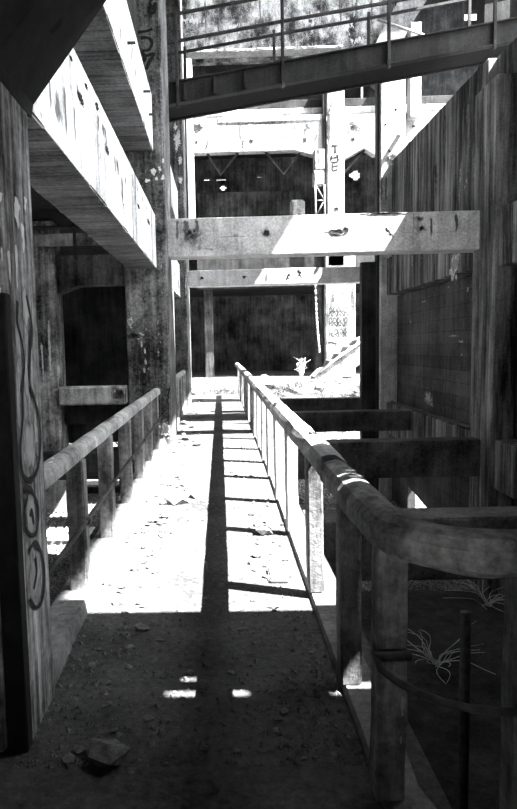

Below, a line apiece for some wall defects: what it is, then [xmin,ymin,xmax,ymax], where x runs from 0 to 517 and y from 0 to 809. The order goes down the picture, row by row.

damp [49,82,76,138]
damp [114,155,147,208]
peeling [1,197,27,289]
spalling [325,226,349,235]